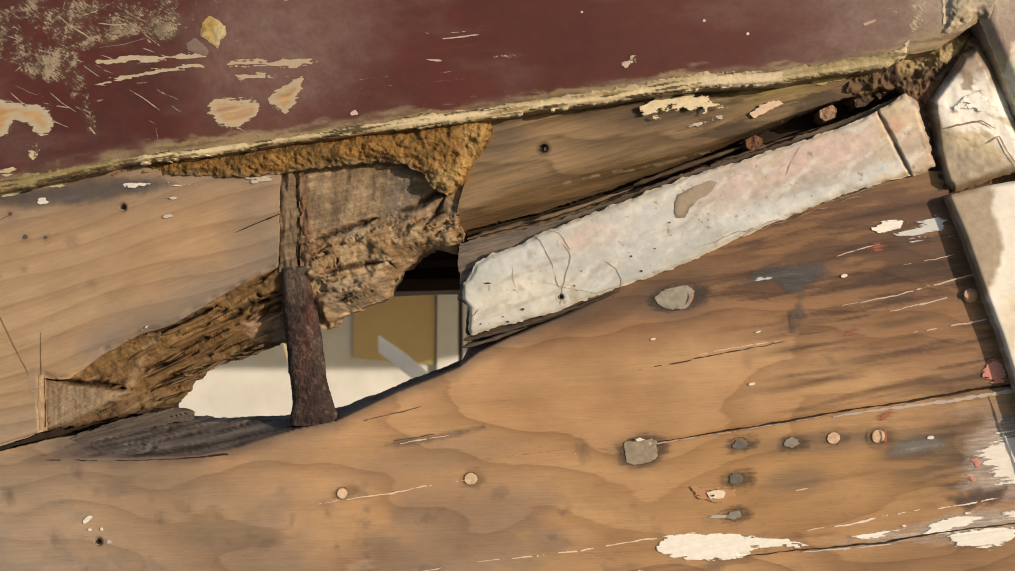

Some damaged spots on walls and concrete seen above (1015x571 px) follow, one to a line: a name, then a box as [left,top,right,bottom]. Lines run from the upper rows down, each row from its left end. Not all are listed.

peeling [95,16,226,86]
peeling [0,100,55,137]
peeling [207,58,321,131]
peeling [640,93,723,128]
peeling [750,100,783,118]
peeling [244,176,272,184]
rust [282,266,338,426]
crack [650,384,1014,444]